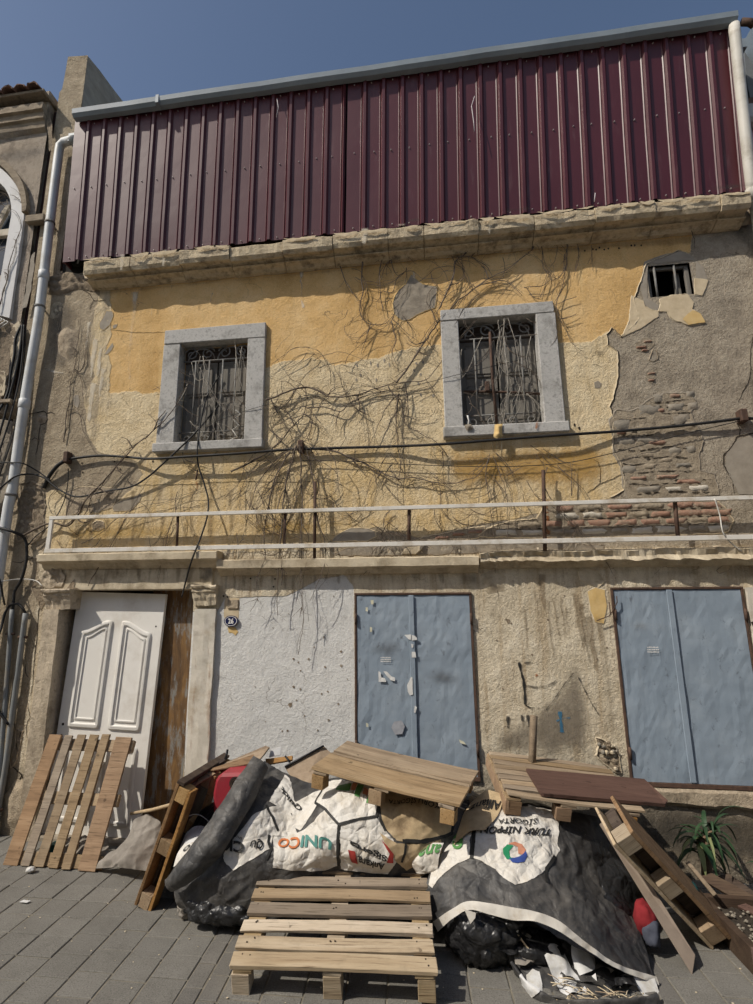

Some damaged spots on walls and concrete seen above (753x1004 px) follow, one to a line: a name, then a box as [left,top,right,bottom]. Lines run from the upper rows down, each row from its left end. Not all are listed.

flaking render [331,251,735,557]
flaking render [726,435,753,495]
flaking render [65,486,142,531]